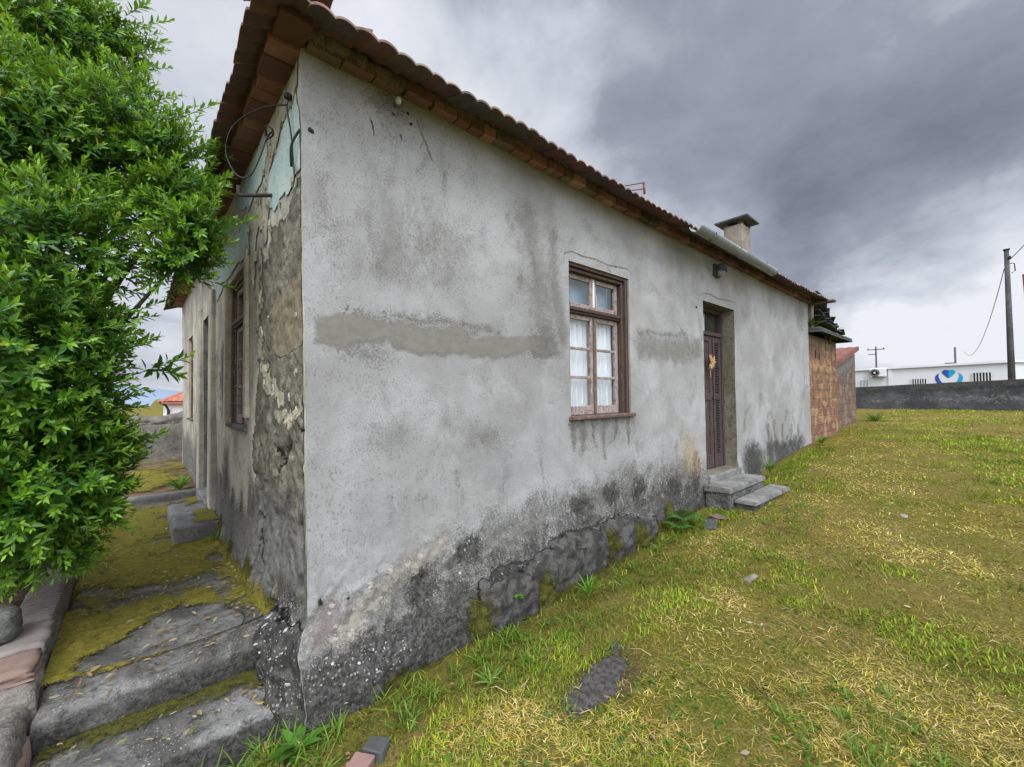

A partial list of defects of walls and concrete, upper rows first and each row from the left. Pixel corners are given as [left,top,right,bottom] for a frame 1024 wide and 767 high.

flaking render [215,58,314,619]
crack [263,429,305,482]
damp [569,417,630,463]
damp [744,422,806,475]
crack [252,494,266,565]
damp [215,448,709,734]